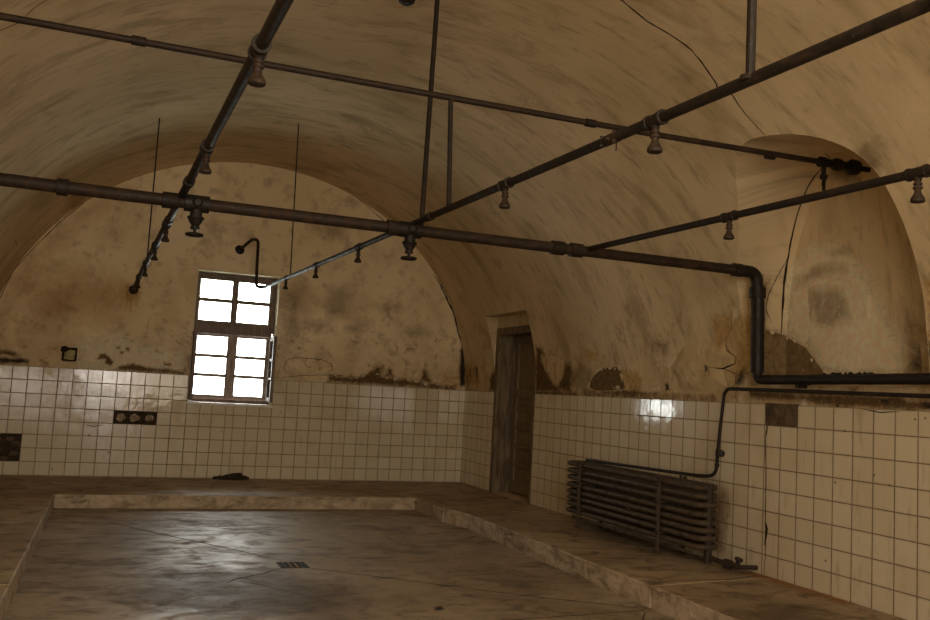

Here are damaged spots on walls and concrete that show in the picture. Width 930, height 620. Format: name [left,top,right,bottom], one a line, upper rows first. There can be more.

crack [621,0,765,135]
peeling [762,247,901,375]
peeling [86,338,187,369]
flaking render [587,365,626,390]
crack [708,406,769,580]
crack [109,522,322,600]
crack [312,568,645,620]